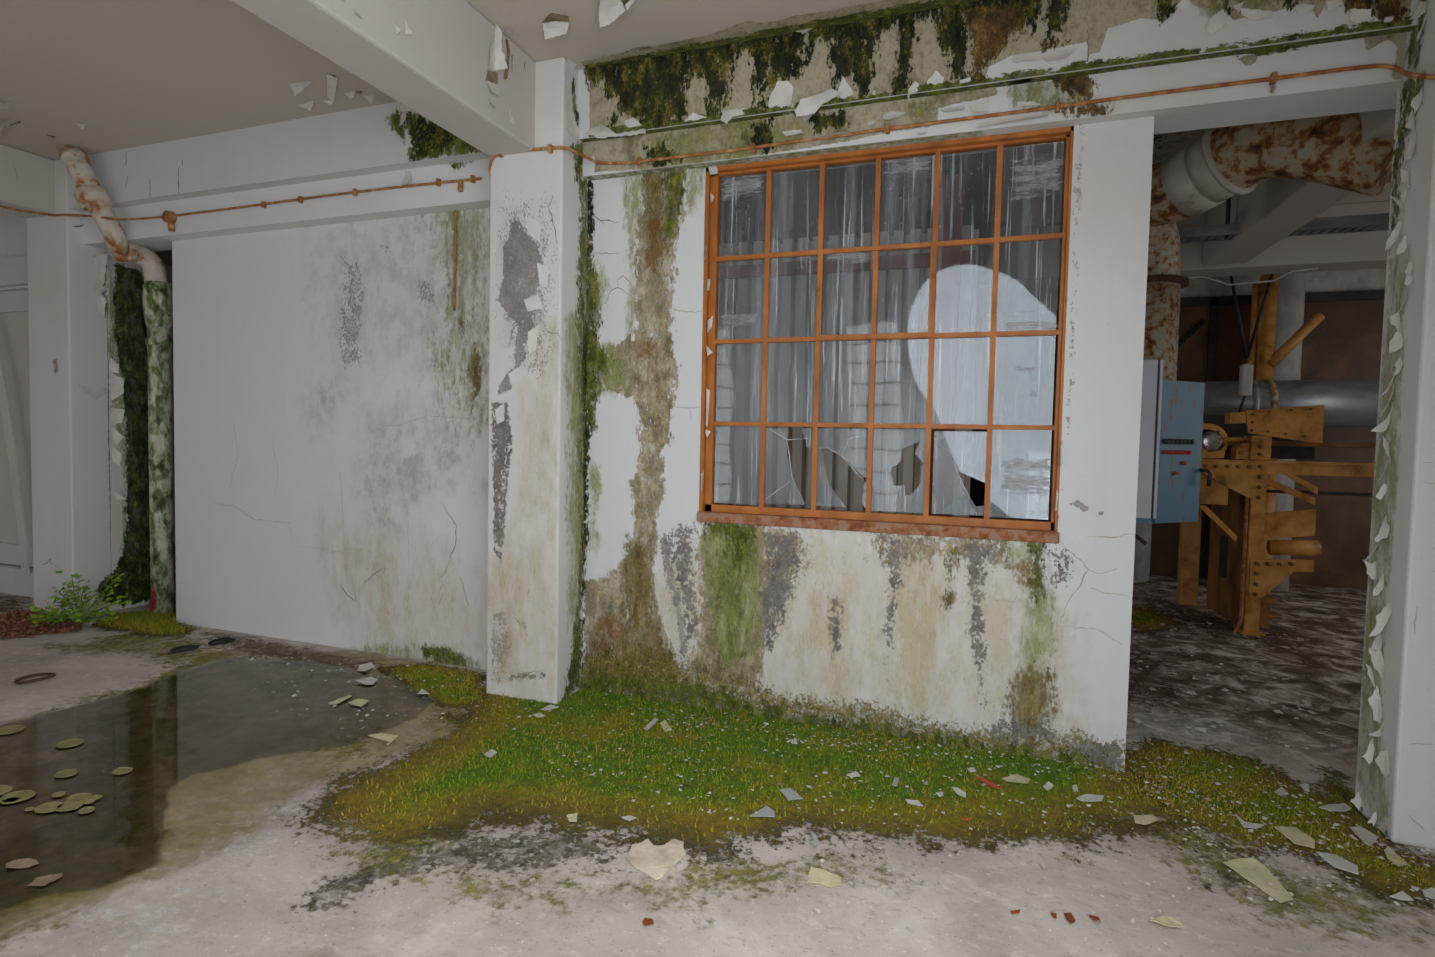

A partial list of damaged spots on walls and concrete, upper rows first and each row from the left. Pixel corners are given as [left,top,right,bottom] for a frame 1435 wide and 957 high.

peeling [289,73,374,111]
peeling [541,13,569,39]
water stain [337,256,363,366]
water stain [419,188,557,406]
spalling [490,217,550,562]
water stain [586,168,703,446]
peeling [582,0,1427,777]
water stain [582,533,677,694]
water stain [872,532,1058,733]